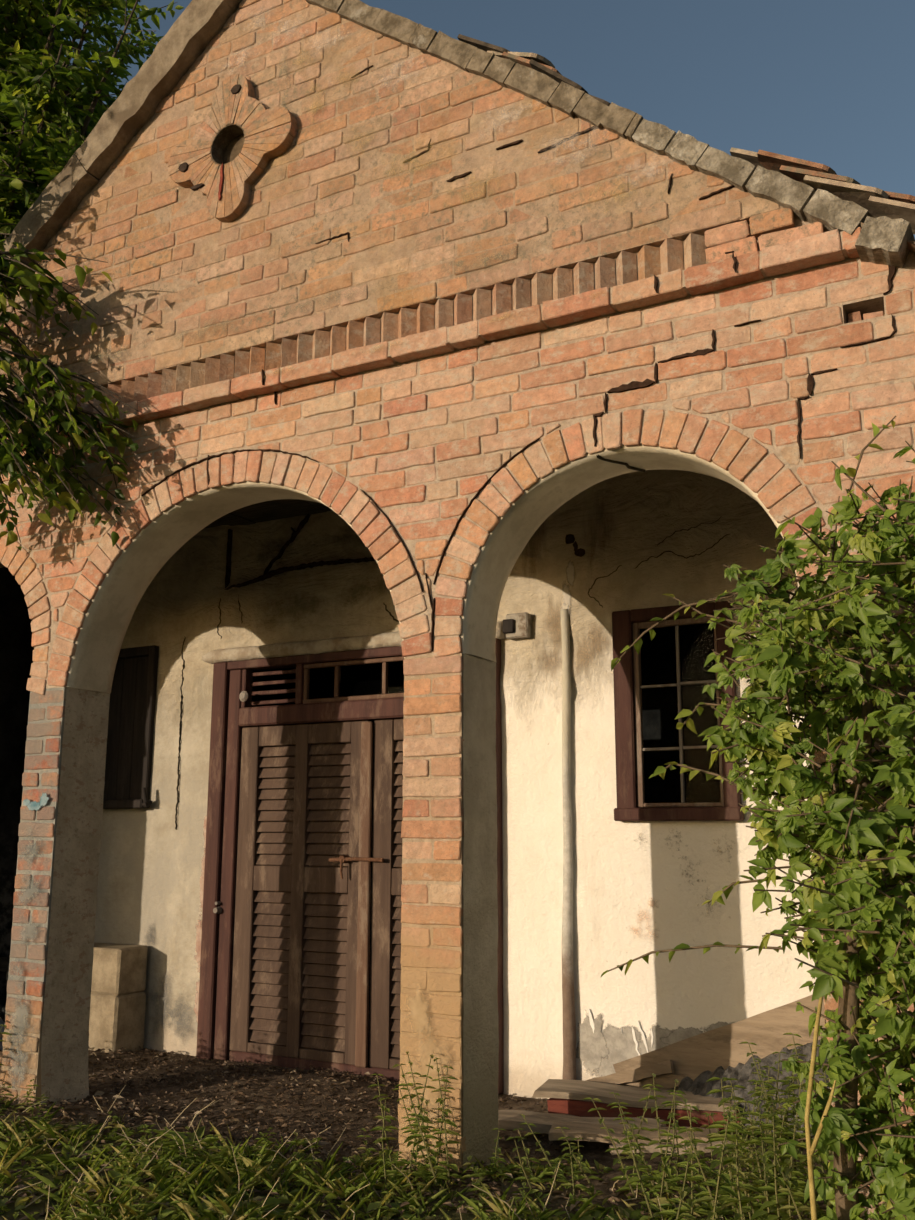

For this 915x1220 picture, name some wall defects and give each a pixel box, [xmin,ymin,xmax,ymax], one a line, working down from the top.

crack [593,319,761,472]
crack [141,449,319,496]
crack [217,514,376,638]
crack [360,438,540,652]
crack [588,517,730,608]
crack [175,636,186,830]
peeling [23,793,49,810]
peeling [576,1013,735,1077]